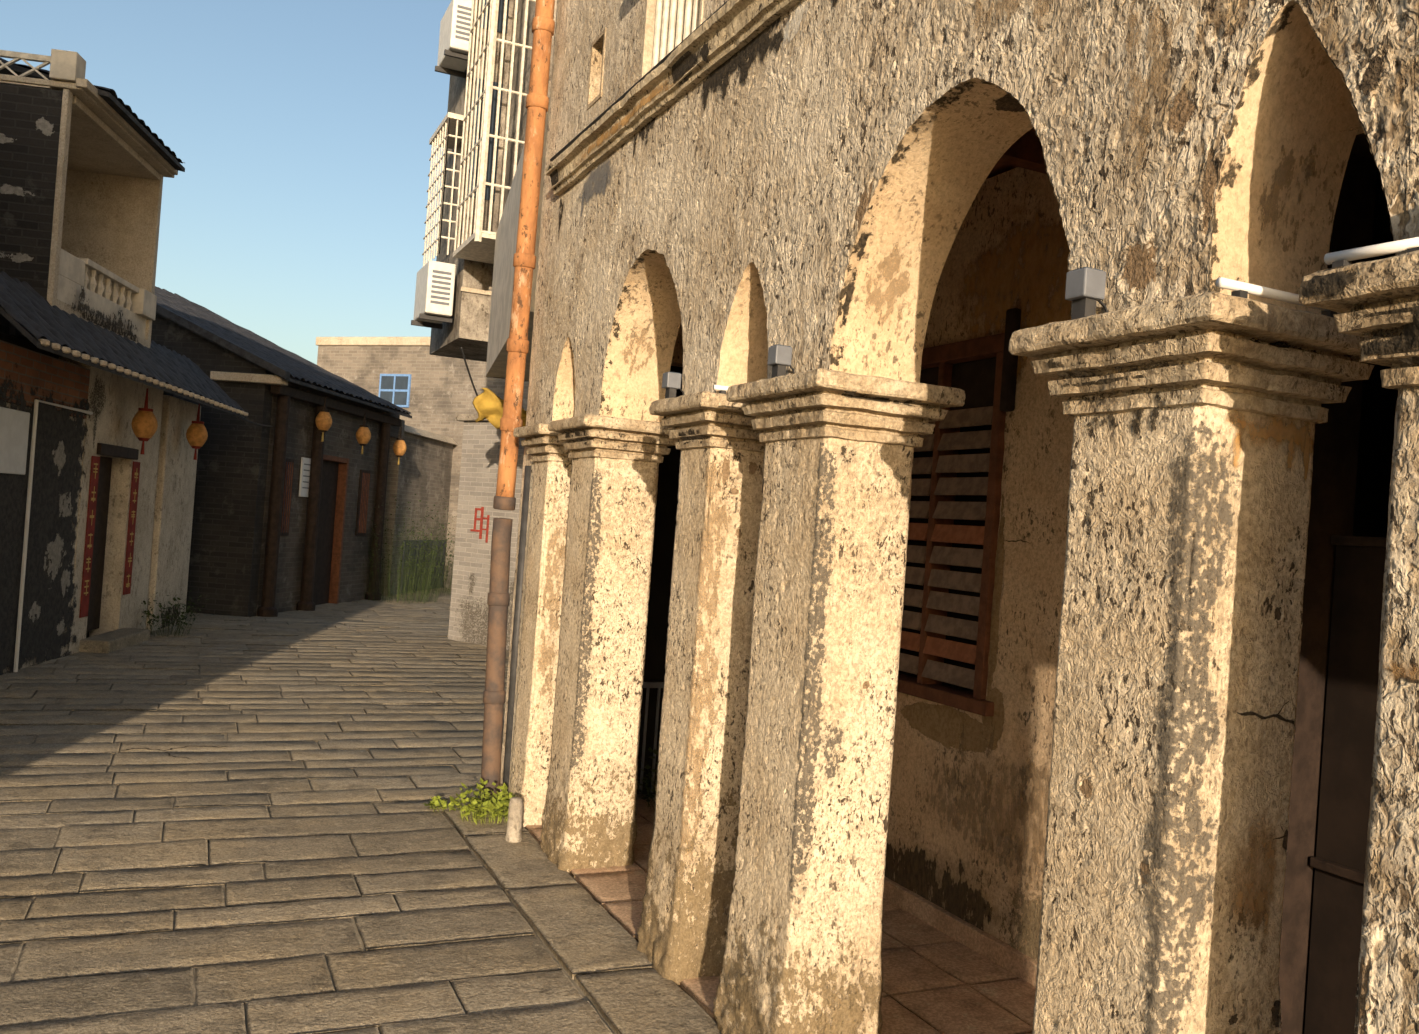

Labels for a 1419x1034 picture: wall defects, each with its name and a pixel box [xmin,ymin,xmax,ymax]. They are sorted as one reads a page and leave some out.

peeling [0,365,90,675]
crack [1237,701,1296,732]
crack [1385,668,1419,683]
damp [884,722,1050,931]